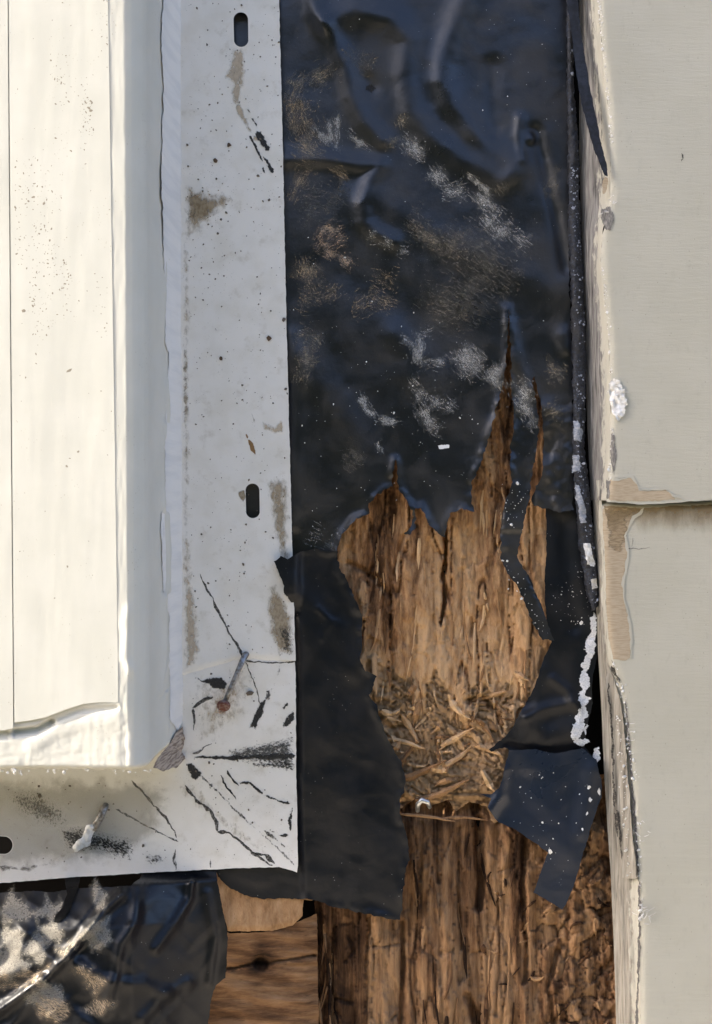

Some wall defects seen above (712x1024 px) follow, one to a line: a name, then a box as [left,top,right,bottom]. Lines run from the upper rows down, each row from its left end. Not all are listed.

peeling [602,434,675,661]
peeling [573,725,601,762]